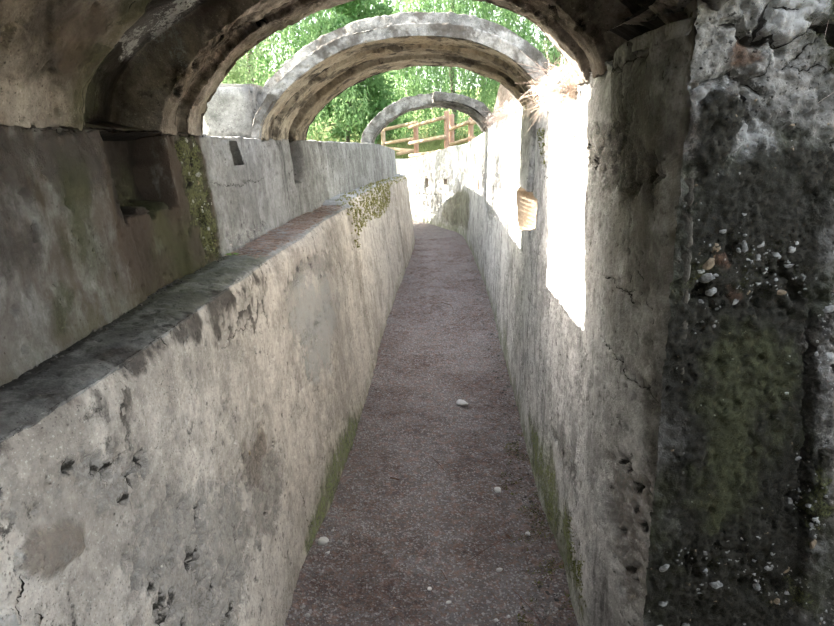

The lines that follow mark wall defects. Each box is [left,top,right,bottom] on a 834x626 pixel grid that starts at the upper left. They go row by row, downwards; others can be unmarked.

leakage [611,43,674,301]
leakage [305,409,363,553]
leakage [528,413,584,618]
leakage [643,88,834,626]
crack [793,309,833,525]